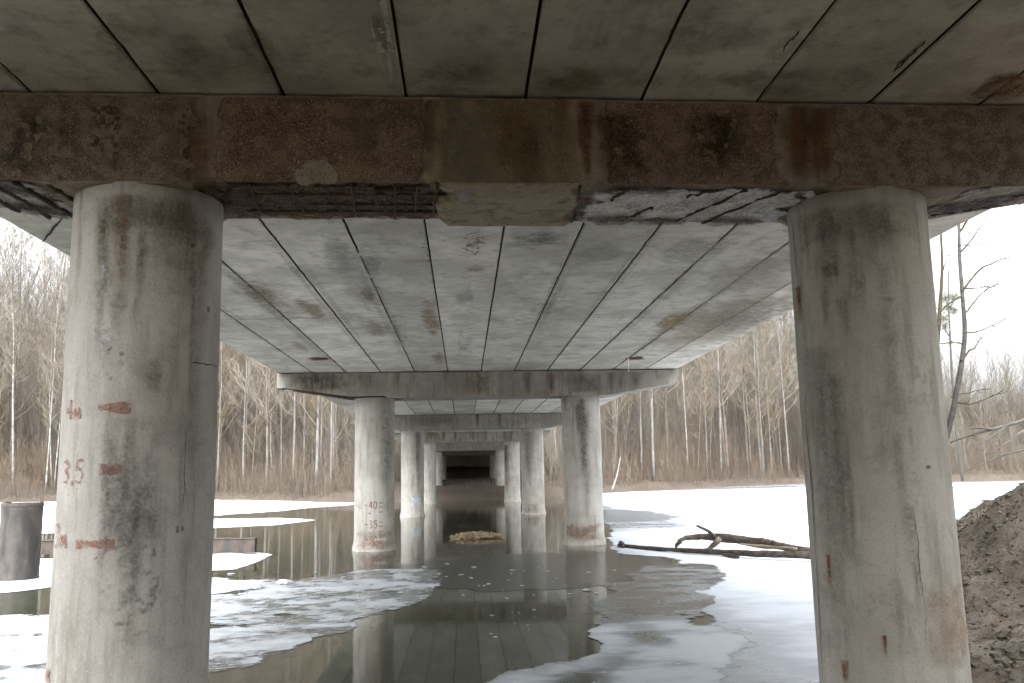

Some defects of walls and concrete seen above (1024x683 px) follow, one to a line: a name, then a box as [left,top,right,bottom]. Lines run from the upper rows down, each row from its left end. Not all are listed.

crack [894,41,925,72]
peeling [0,94,201,220]
peeling [200,97,458,223]
crack [914,514,926,643]